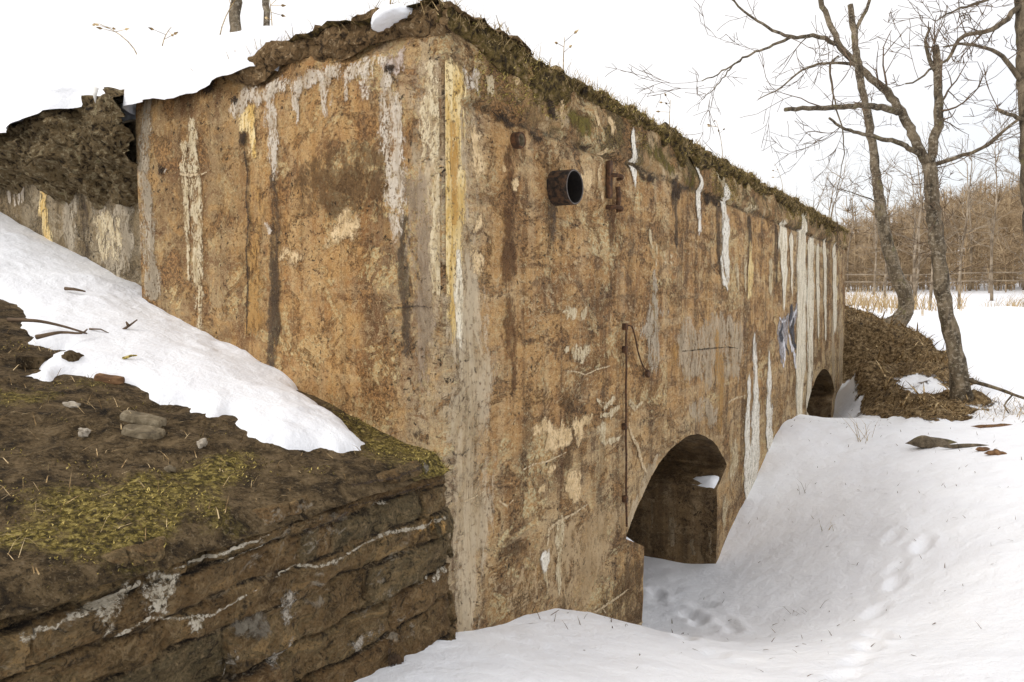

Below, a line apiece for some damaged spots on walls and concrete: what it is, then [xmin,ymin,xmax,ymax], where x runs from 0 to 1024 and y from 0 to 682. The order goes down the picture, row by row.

leakage [179,118,204,331]
leakage [230,47,526,632]
leakage [627,128,704,371]
leakage [769,205,843,415]